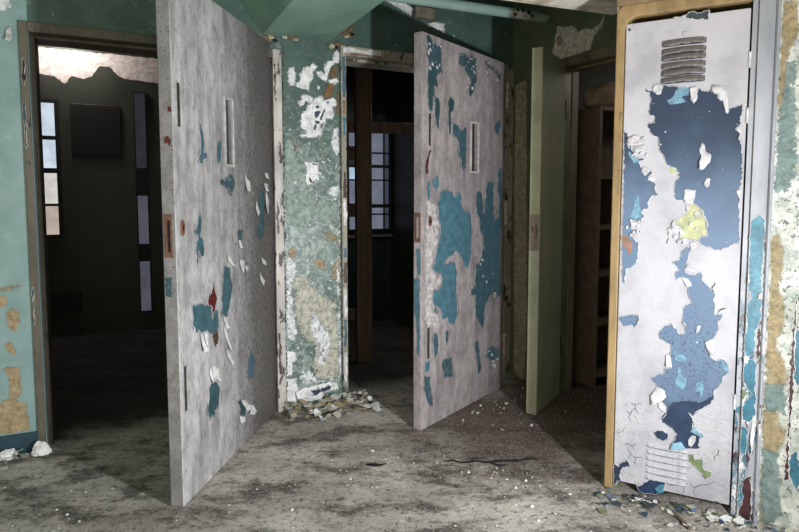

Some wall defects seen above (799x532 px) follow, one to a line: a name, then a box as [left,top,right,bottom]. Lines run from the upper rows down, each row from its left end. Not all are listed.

peeling [304,161,320,185]
peeling [287,24,381,156]
peeling [329,172,348,225]
peeling [426,22,445,53]
peeling [427,63,467,171]
peeling [552,15,605,59]
peeling [773,60,799,193]
peeling [278,247,348,402]
peeling [413,168,503,407]
peeling [619,84,799,524]
peeling [0,367,30,434]
peeling [613,460,631,485]